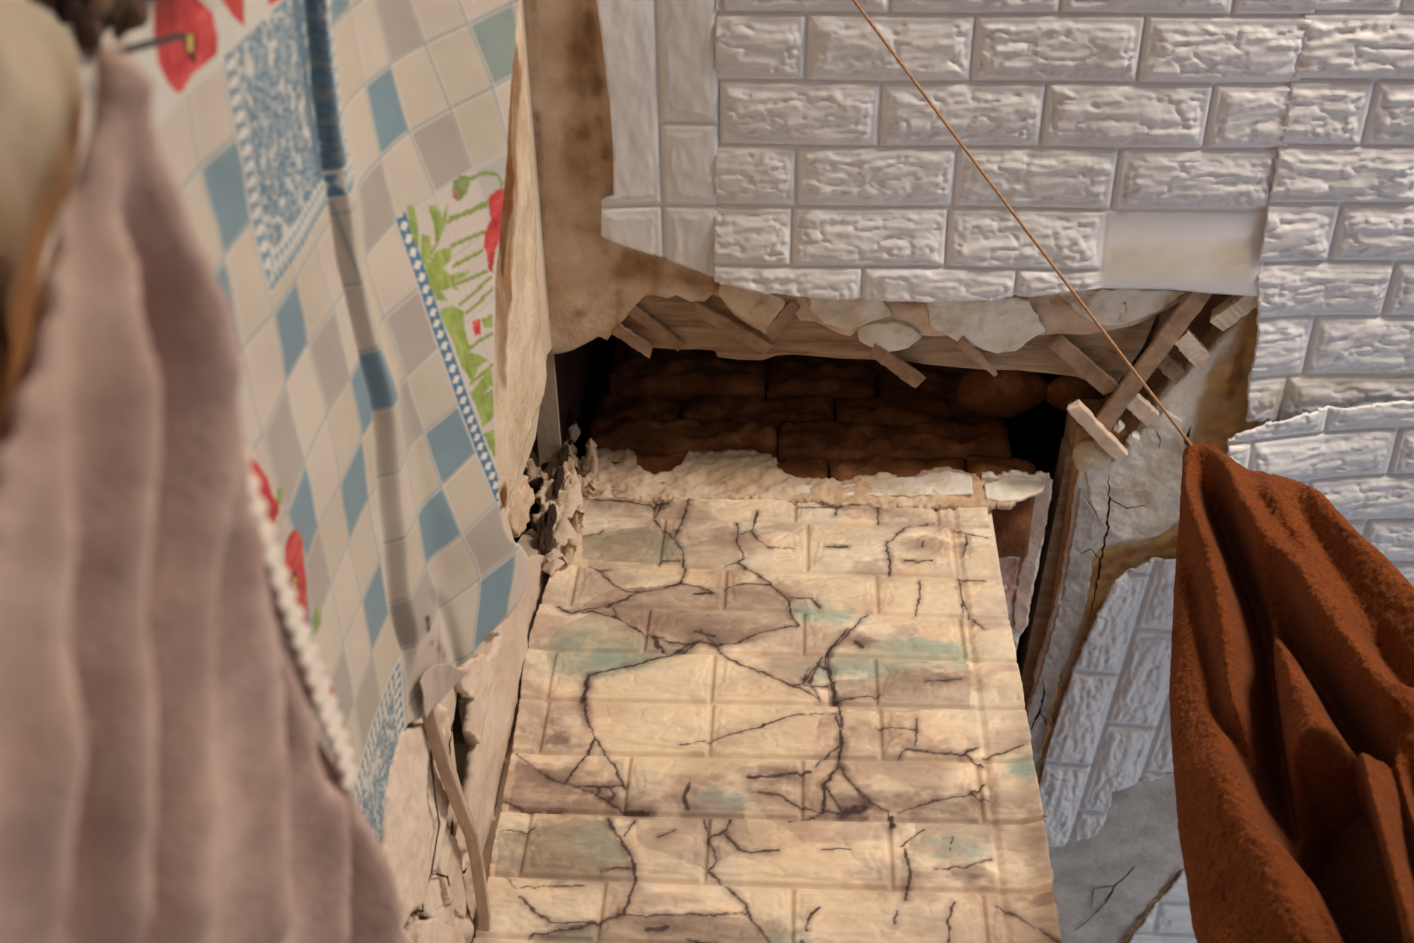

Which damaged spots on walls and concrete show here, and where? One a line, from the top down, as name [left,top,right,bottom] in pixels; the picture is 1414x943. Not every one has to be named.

flaking render [380,0,1190,943]
crack [1030,680,1054,730]
crack [1080,474,1146,620]
flaking render [1026,296,1257,784]